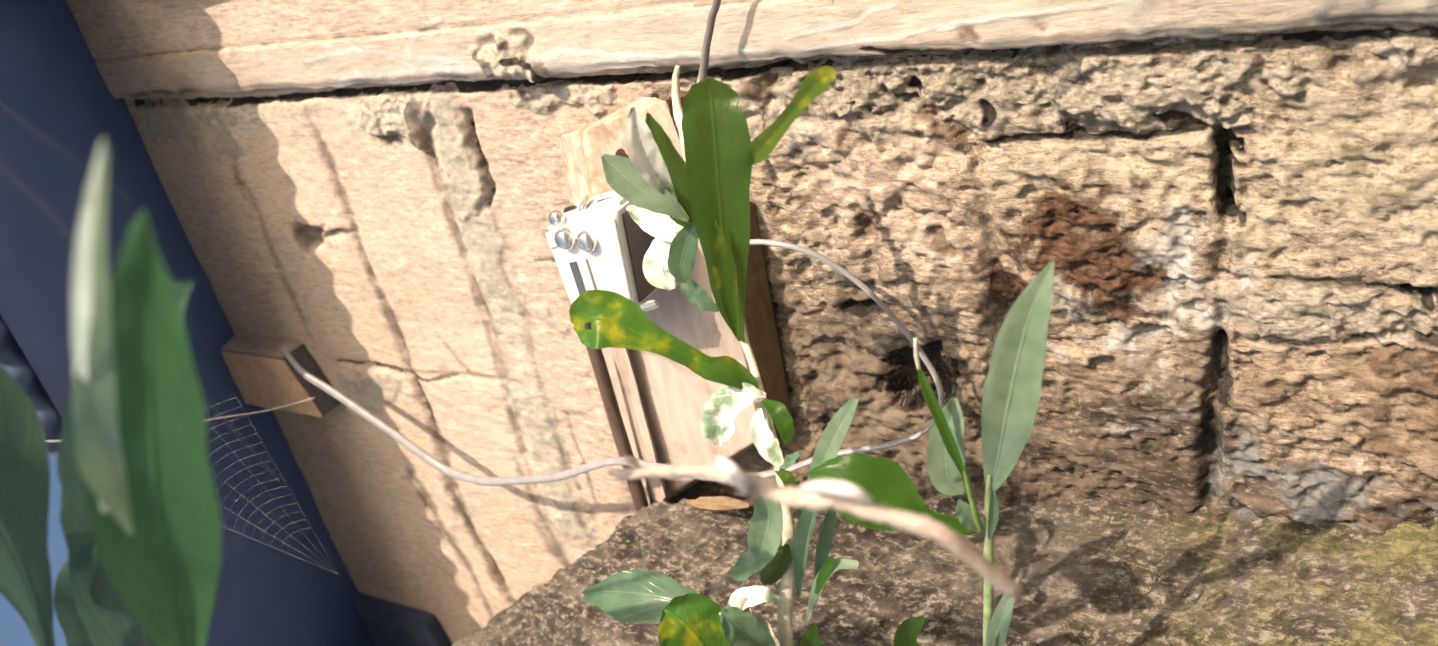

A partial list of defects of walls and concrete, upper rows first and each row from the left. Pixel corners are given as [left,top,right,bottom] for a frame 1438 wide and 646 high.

crack [1251,27,1438,46]
crack [323,149,357,237]
crack [134,46,1073,209]
rust [973,172,1180,322]
crack [986,111,1246,227]
damp [1133,209,1220,332]
spalling [1246,276,1438,349]
damp [768,280,996,487]
crack [1196,329,1261,518]
damp [667,480,720,504]